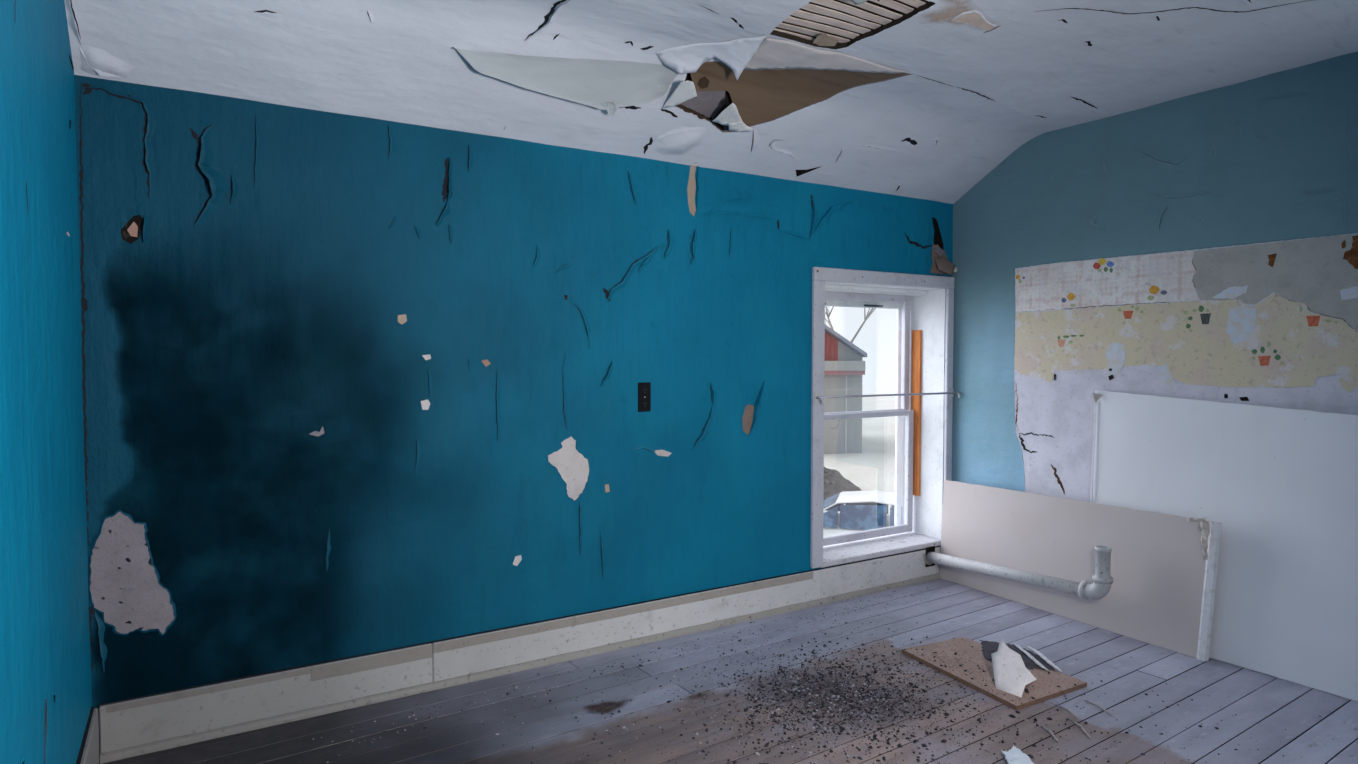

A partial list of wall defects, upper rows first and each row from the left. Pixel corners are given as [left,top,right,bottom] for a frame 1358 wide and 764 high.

crack [524,0,574,43]
spalling [950,10,1001,33]
crack [1044,0,1313,46]
spalling [655,0,930,132]
crack [917,75,995,101]
crack [643,137,653,154]
crack [902,137,917,145]
spalling [121,215,150,244]
peeling [741,381,765,436]
peeling [547,349,590,556]
crack [1015,381,1065,494]
peeling [88,510,176,673]